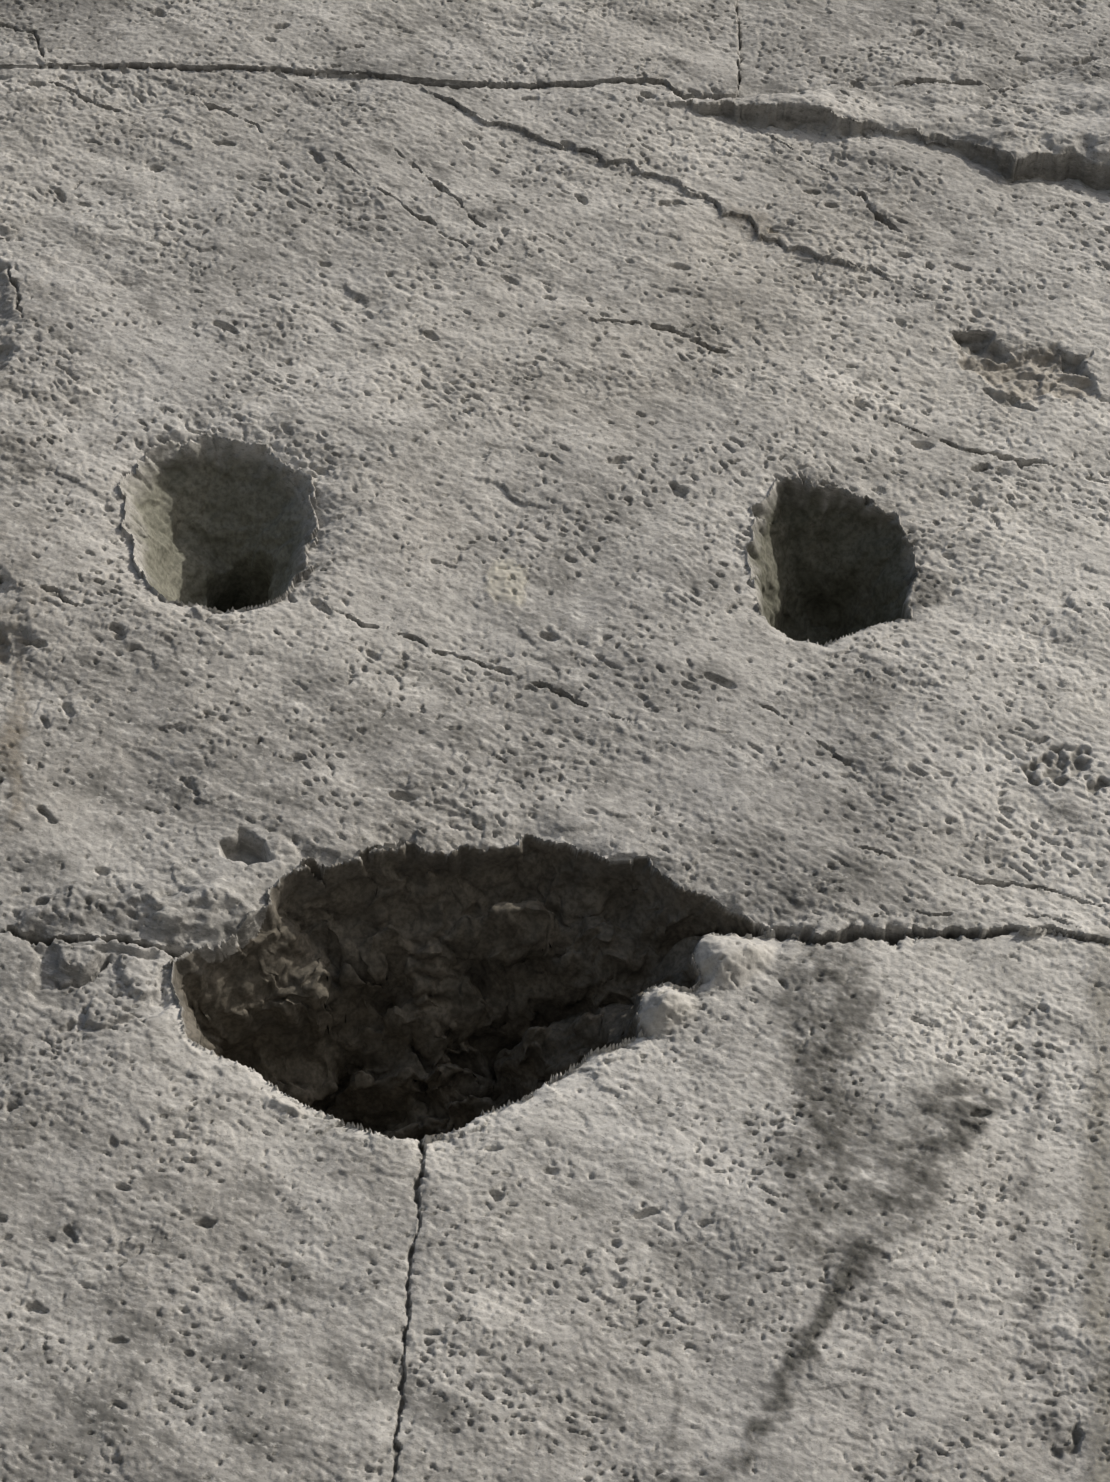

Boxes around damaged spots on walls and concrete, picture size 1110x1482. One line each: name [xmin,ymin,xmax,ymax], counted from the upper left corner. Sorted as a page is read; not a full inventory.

crack [0,0,933,306]
crack [869,77,1039,93]
crack [0,924,192,960]
spalling [26,825,782,1141]
crack [391,1138,428,1482]
damp [745,1241,877,1465]